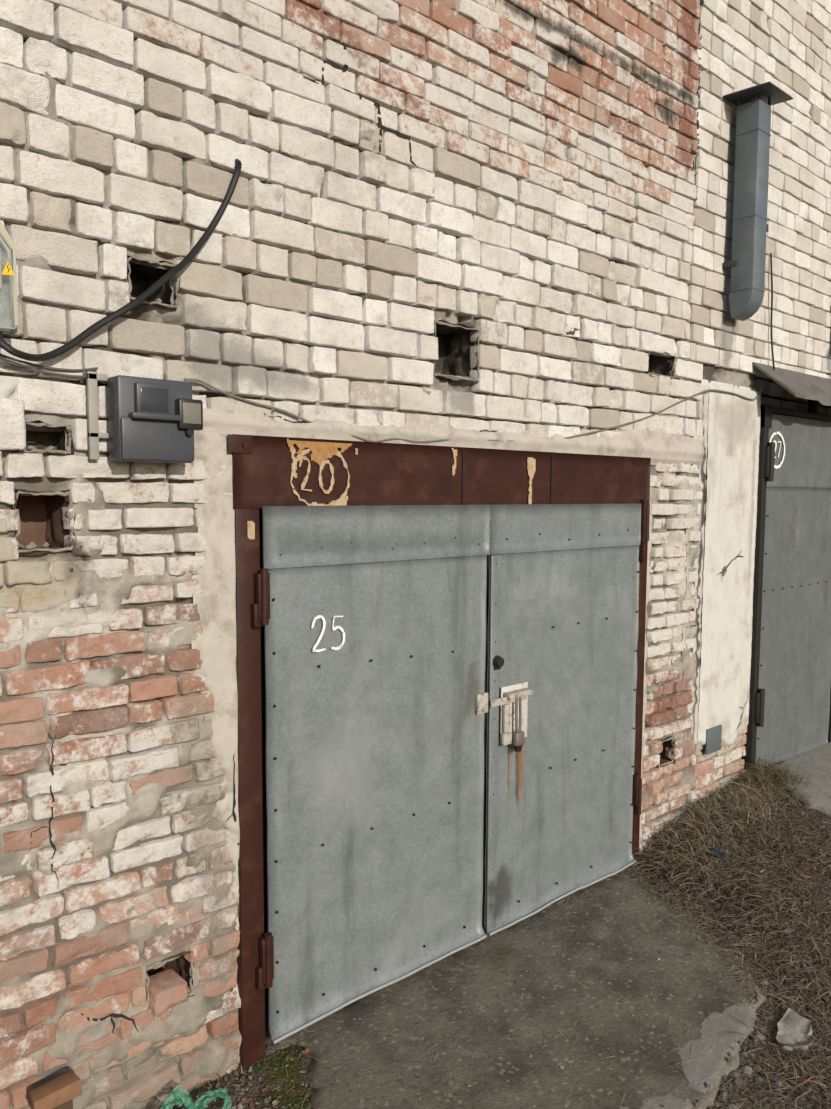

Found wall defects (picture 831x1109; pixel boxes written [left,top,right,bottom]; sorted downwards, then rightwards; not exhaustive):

peeling [287,439,358,506]
peeling [527,457,536,504]
peeling [648,670,692,768]
rust [510,744,524,800]
crack [30,727,67,889]